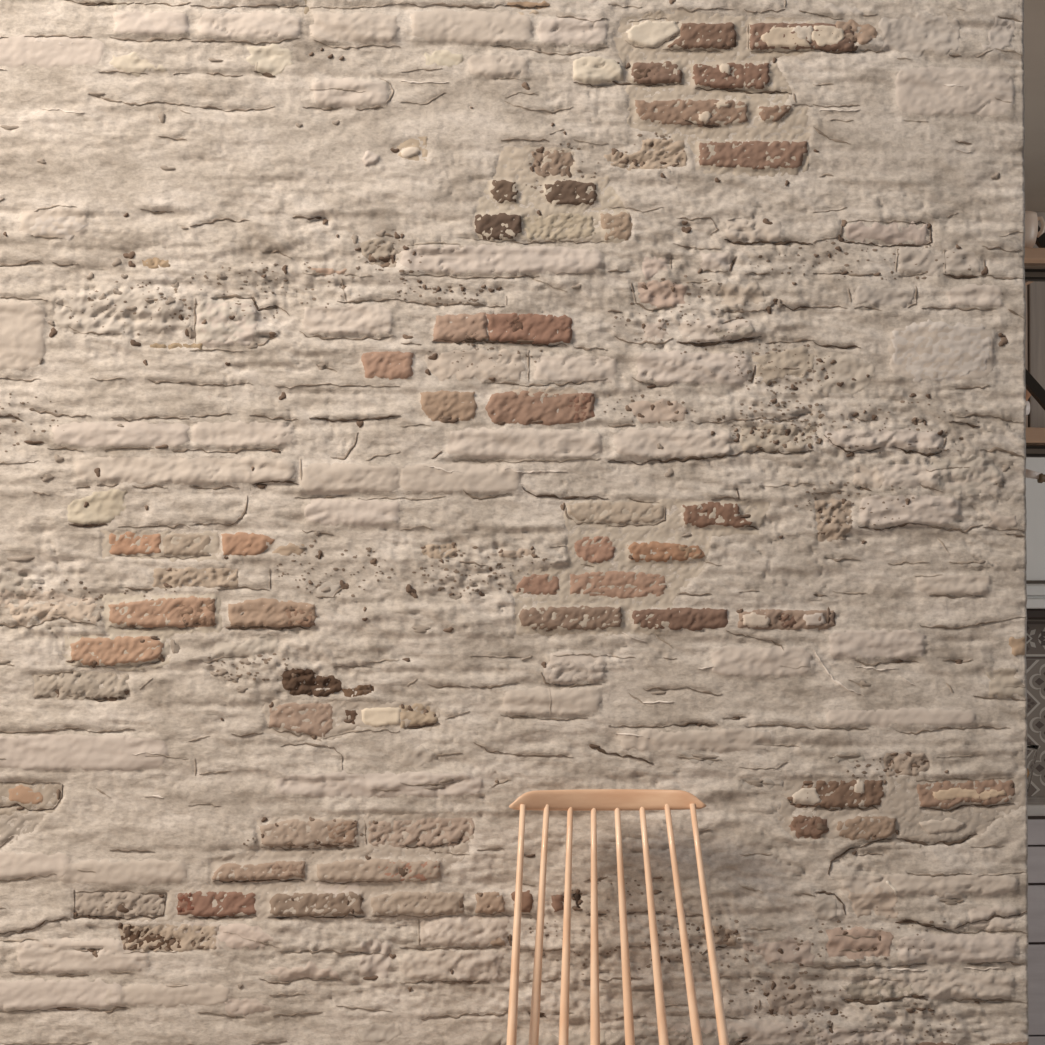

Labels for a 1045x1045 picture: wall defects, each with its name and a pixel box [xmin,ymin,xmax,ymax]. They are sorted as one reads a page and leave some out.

peeling [473,0,877,244]
spalling [328,230,695,426]
peeling [406,498,836,637]
spalling [208,653,440,742]
peeling [778,752,1026,847]
peeling [75,812,591,952]